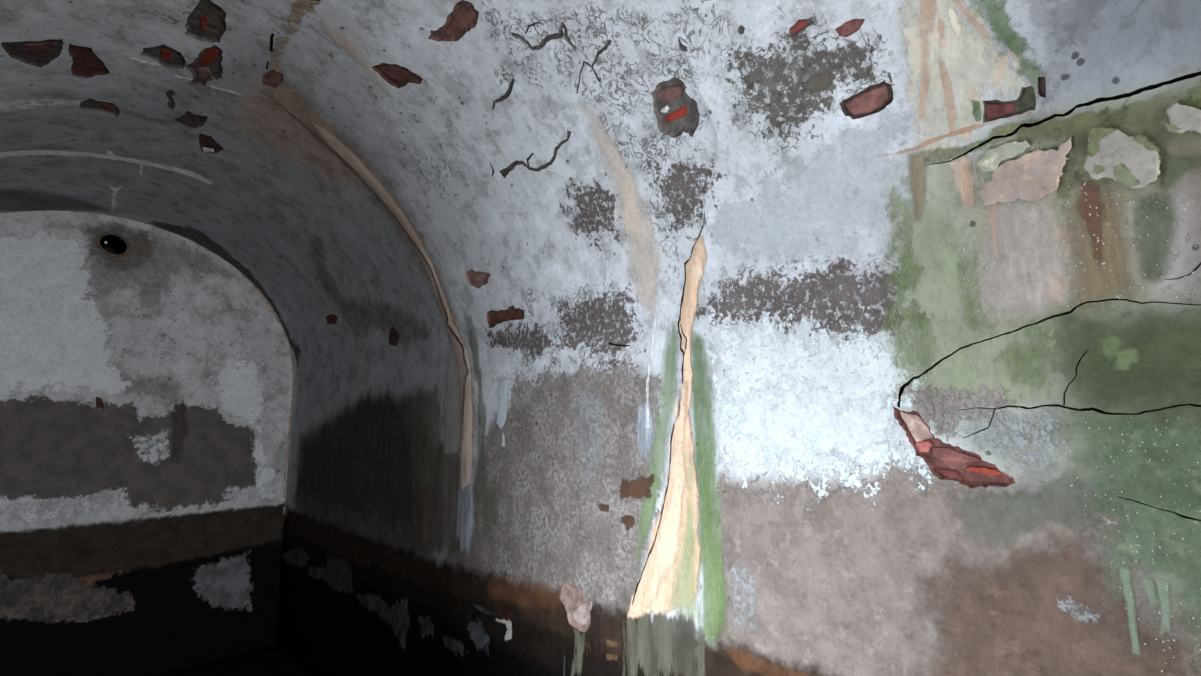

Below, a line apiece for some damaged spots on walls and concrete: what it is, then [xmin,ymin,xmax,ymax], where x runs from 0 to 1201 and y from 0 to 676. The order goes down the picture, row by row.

spalling [139,0,227,87]
crack [490,130,571,178]
crack [511,22,611,93]
spalling [645,77,730,249]
peeling [717,18,900,154]
spalling [983,77,1046,123]
crack [925,71,1201,166]
leakage [0,0,820,676]
crack [898,263,1201,407]
leakage [945,406,1066,470]
peeling [695,377,1201,676]
leakage [931,544,1183,676]